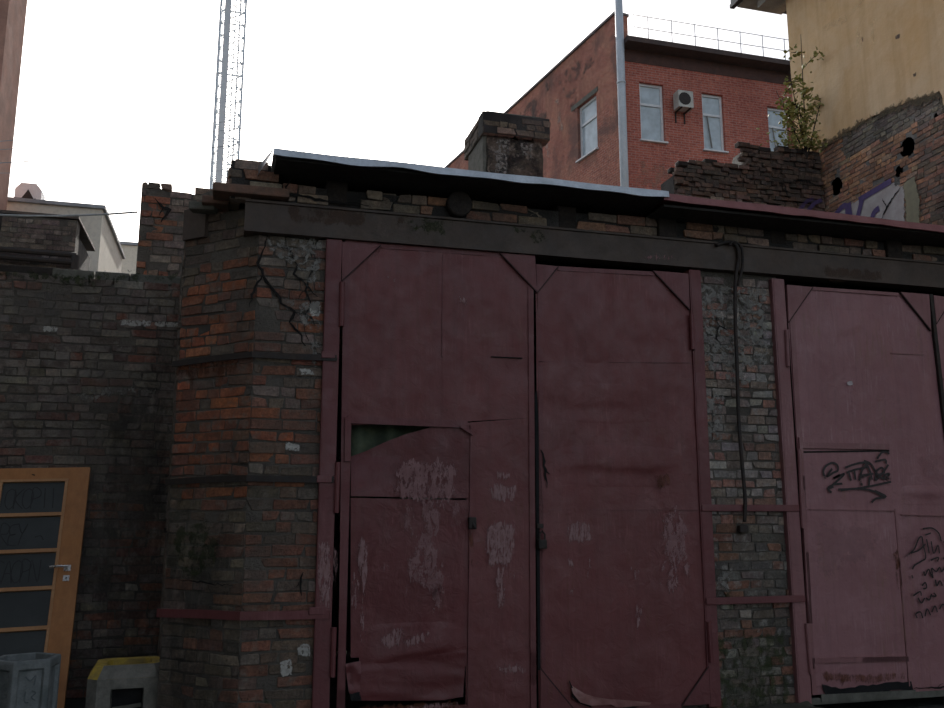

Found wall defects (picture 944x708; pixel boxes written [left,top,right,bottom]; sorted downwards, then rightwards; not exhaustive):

crack [249,235,318,346]
peeling [317,541,338,608]
peeling [393,456,461,610]
peeling [485,519,515,607]